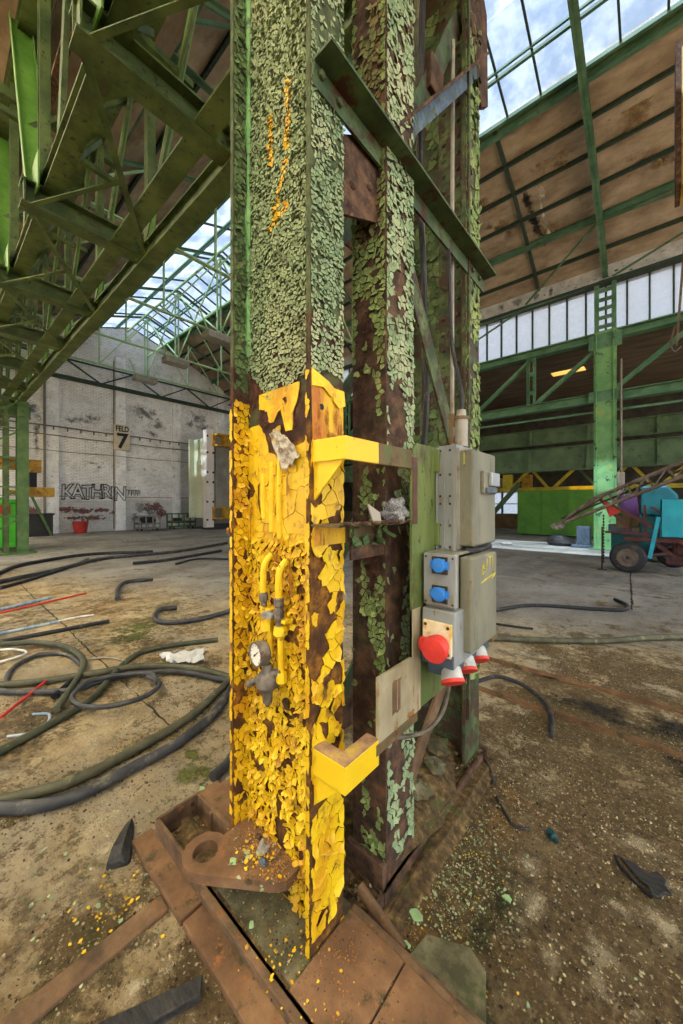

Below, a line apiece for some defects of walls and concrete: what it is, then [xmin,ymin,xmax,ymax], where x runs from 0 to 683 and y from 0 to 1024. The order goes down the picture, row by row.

peeling [466,0,482,249]
water stain [516,187,557,246]
peeling [466,276,482,451]
peeling [211,0,439,993]
corrosion [392,677,419,731]